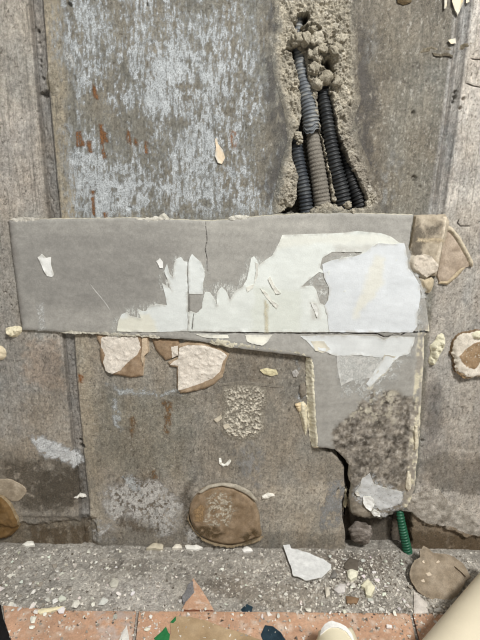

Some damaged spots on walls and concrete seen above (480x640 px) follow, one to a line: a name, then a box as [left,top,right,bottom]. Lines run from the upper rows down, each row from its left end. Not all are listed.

rust [99,124,108,159]
water stain [57,0,288,218]
spalling [271,0,385,215]
peeling [62,231,426,448]
water stain [5,436,84,511]
crack [333,449,351,523]